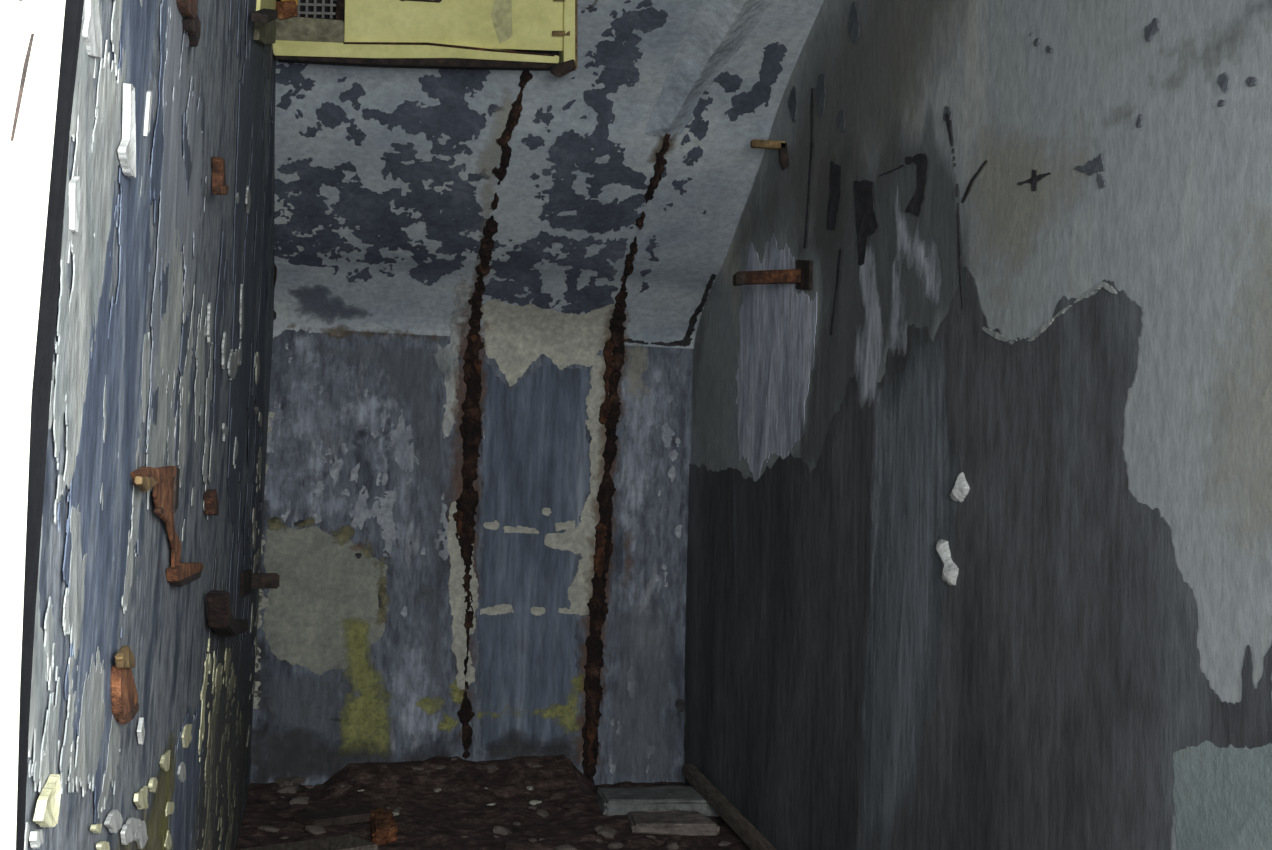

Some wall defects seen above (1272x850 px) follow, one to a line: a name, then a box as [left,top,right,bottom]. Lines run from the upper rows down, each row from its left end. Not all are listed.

peeling [1144,18,1160,42]
peeling [1218,72,1231,107]
flaking render [826,161,878,265]
flaking render [905,153,928,217]
flaking render [1074,153,1106,189]
crack [625,274,716,347]
rust [733,260,813,290]
peeling [24,0,787,850]
peeling [658,233,1272,850]
leakage [200,618,464,850]
leakage [118,736,176,850]